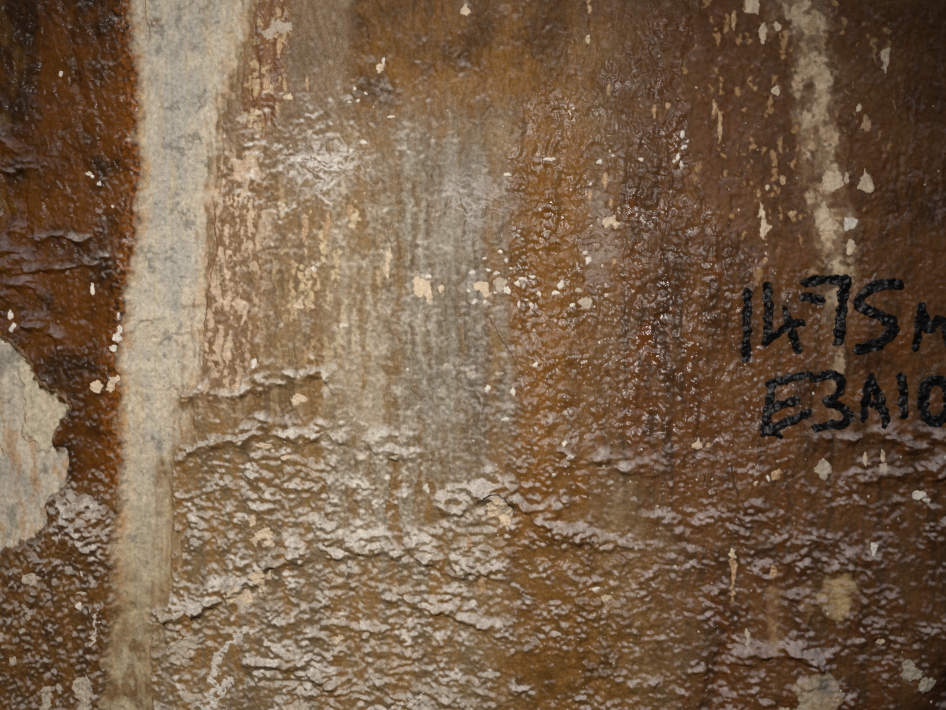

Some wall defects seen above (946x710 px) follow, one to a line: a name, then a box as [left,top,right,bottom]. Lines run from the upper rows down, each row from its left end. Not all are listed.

peeling [260,6,292,58]
damp [366,0,898,328]
corrosion [0,0,142,519]
spalling [0,310,72,559]
peeling [290,394,308,406]
damp [96,0,523,710]
damp [826,347,846,395]
peeling [21,573,42,587]
corrosion [0,523,120,710]
damp [765,571,861,640]
peeling [40,676,93,710]
damp [894,634,946,710]